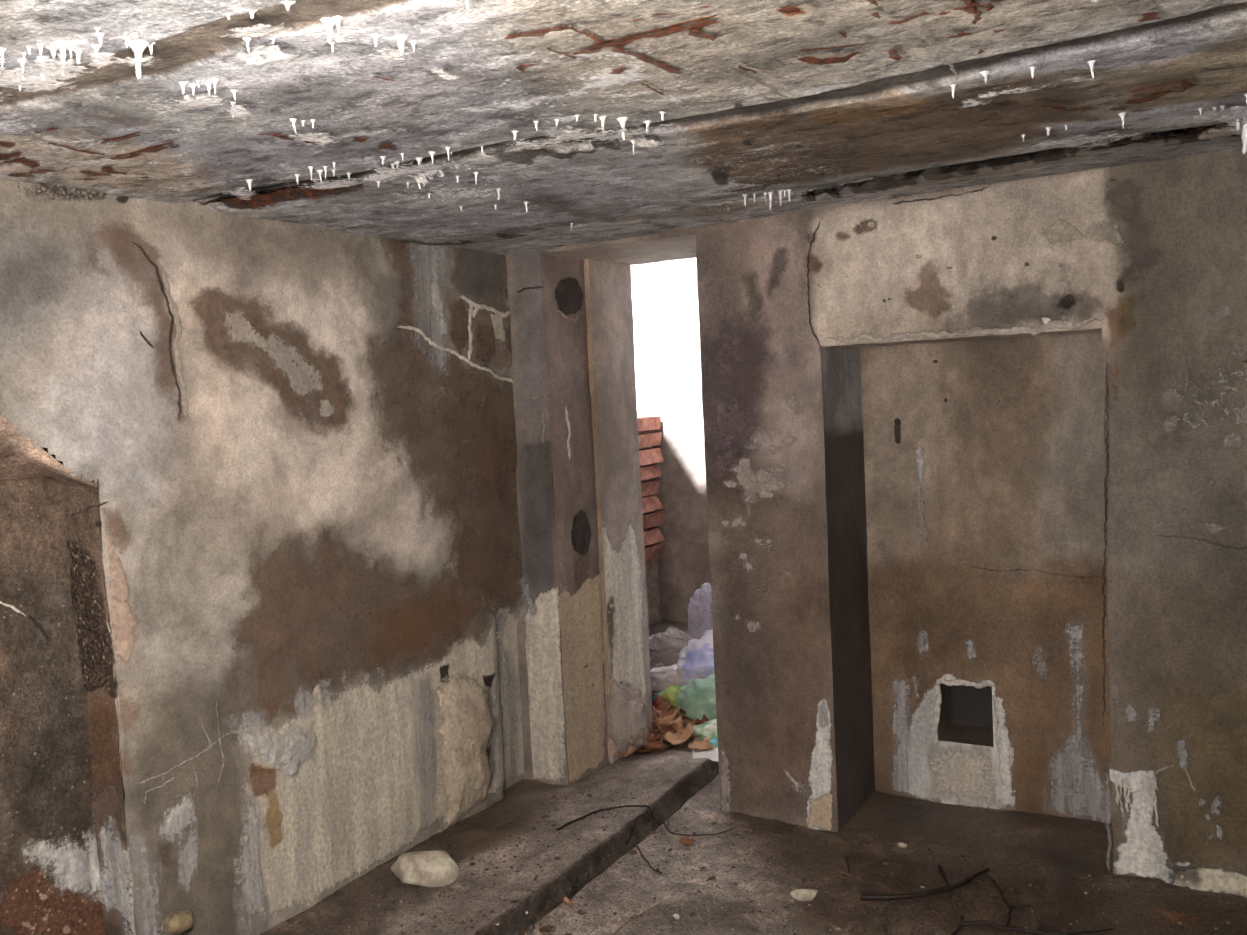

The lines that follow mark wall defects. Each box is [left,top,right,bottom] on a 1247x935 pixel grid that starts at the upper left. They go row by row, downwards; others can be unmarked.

efflorescence [0,27,156,102]
efflorescence [289,119,339,146]
leakage [506,111,688,154]
leakage [214,179,255,200]
efflorescence [288,147,509,212]
crack [136,244,188,416]
leakage [192,289,352,430]
crack [397,286,574,459]
crack [0,601,48,639]
leakage [229,238,646,933]
spalling [250,766,282,848]